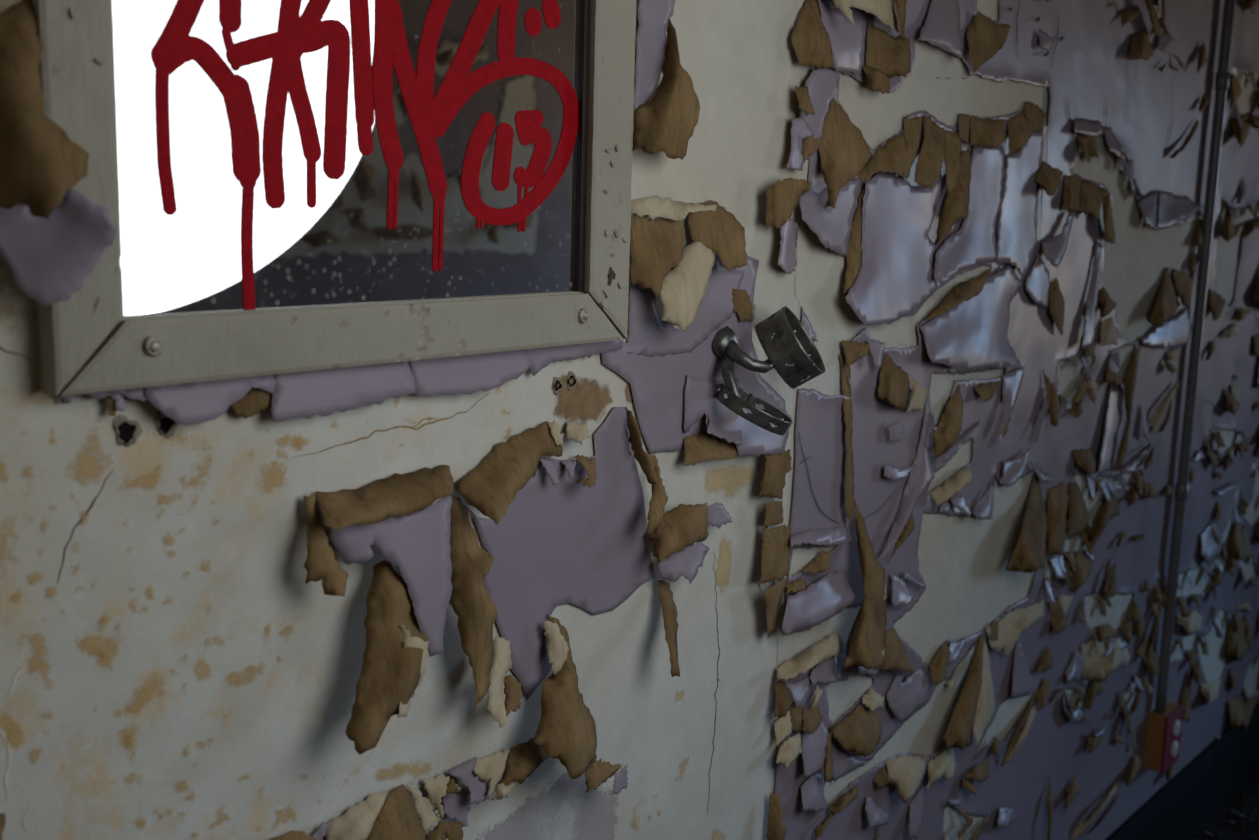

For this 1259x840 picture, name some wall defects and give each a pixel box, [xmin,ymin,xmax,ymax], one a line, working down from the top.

peeling [0,0,118,307]
peeling [633,0,700,160]
crack [57,470,114,583]
damp [79,616,118,666]
damp [265,436,308,490]
peeling [303,420,597,755]
peeling [626,407,734,677]
peeling [683,0,1259,840]
damp [0,715,41,762]